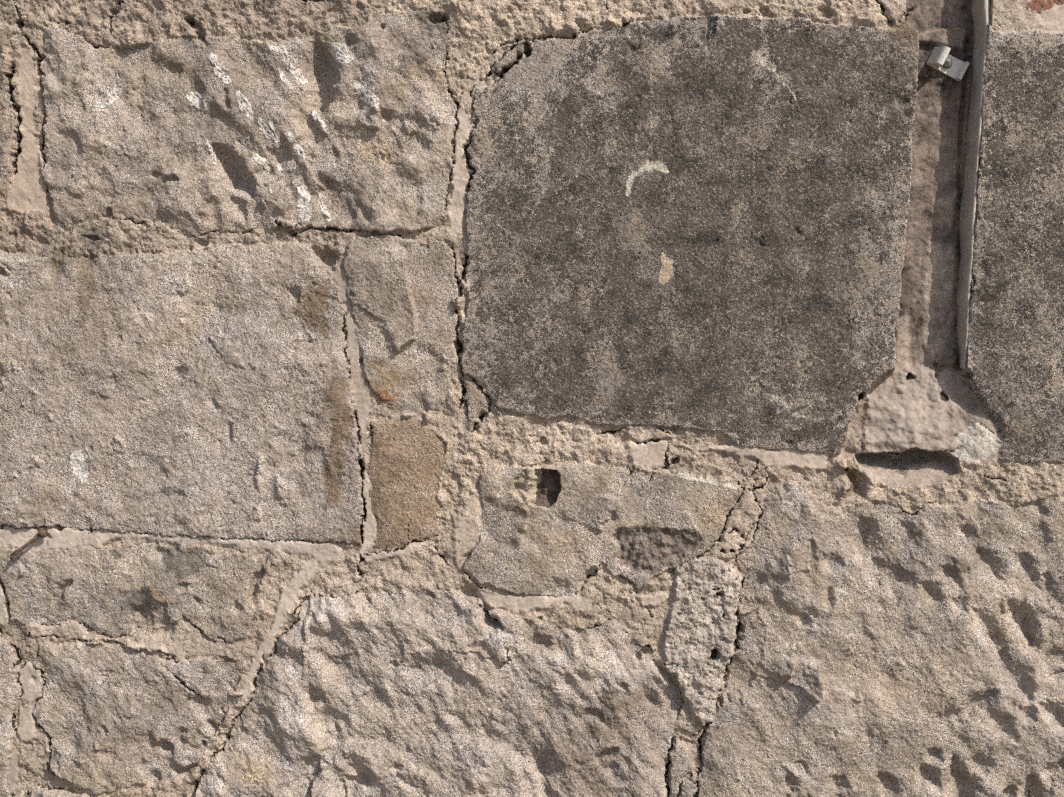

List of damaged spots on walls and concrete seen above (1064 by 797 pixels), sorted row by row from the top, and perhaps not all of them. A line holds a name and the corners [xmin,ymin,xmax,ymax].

crack [342,313,351,380]
crack [0,410,511,797]
crack [665,459,768,797]